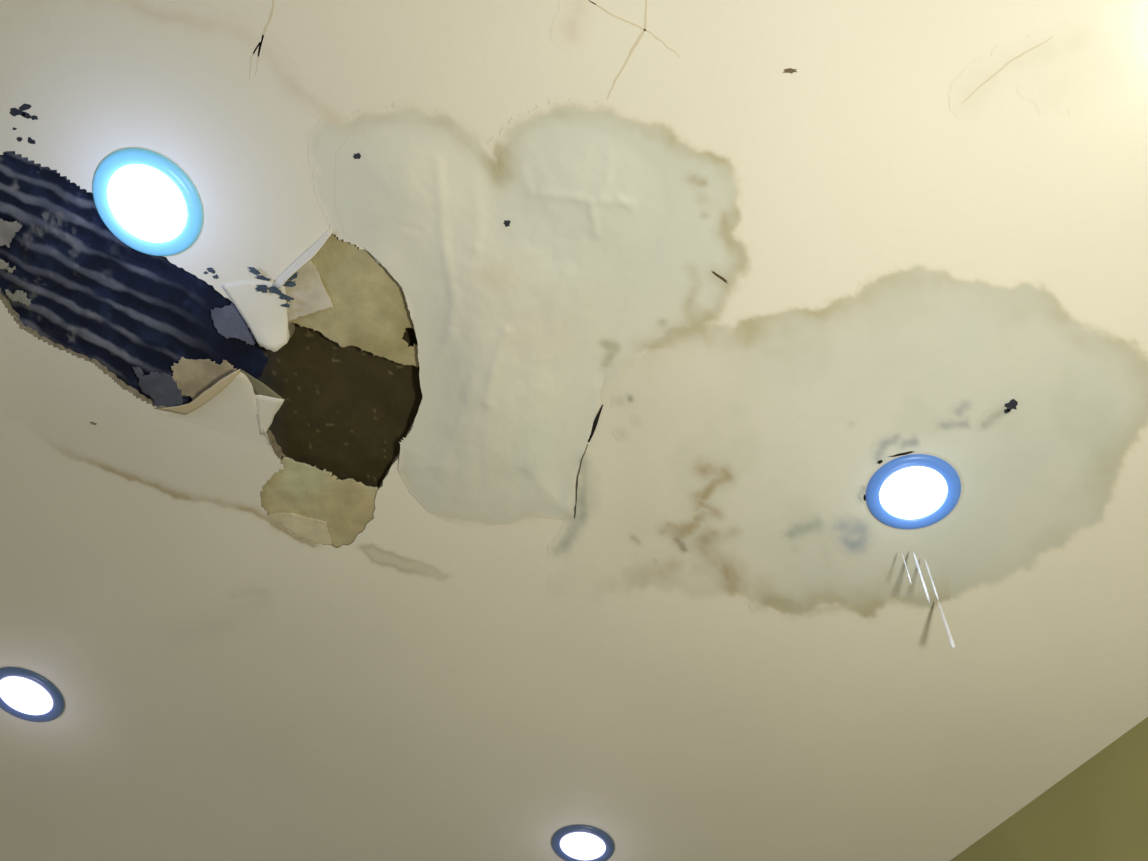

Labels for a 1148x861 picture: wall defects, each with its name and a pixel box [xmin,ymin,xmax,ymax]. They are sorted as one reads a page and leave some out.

crack [249,0,274,80]
crack [589,0,680,100]
peeling [0,104,422,547]
leakage [0,0,1148,649]